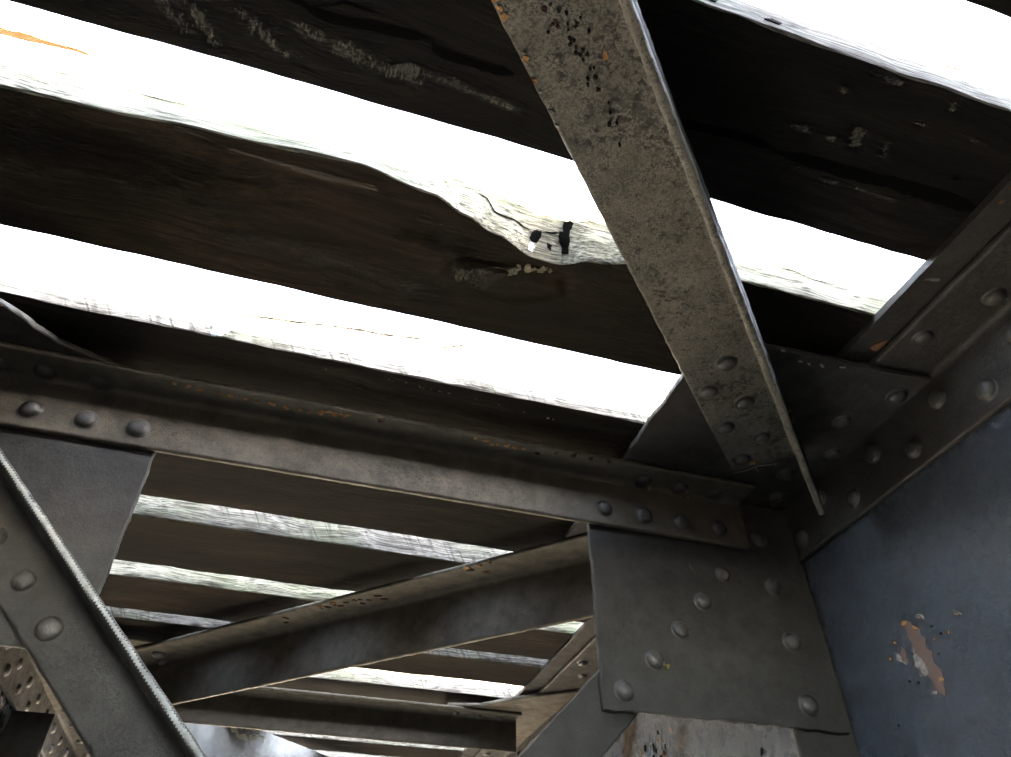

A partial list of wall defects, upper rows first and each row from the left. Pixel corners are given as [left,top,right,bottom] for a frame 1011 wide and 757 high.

peeling [888,614,950,696]